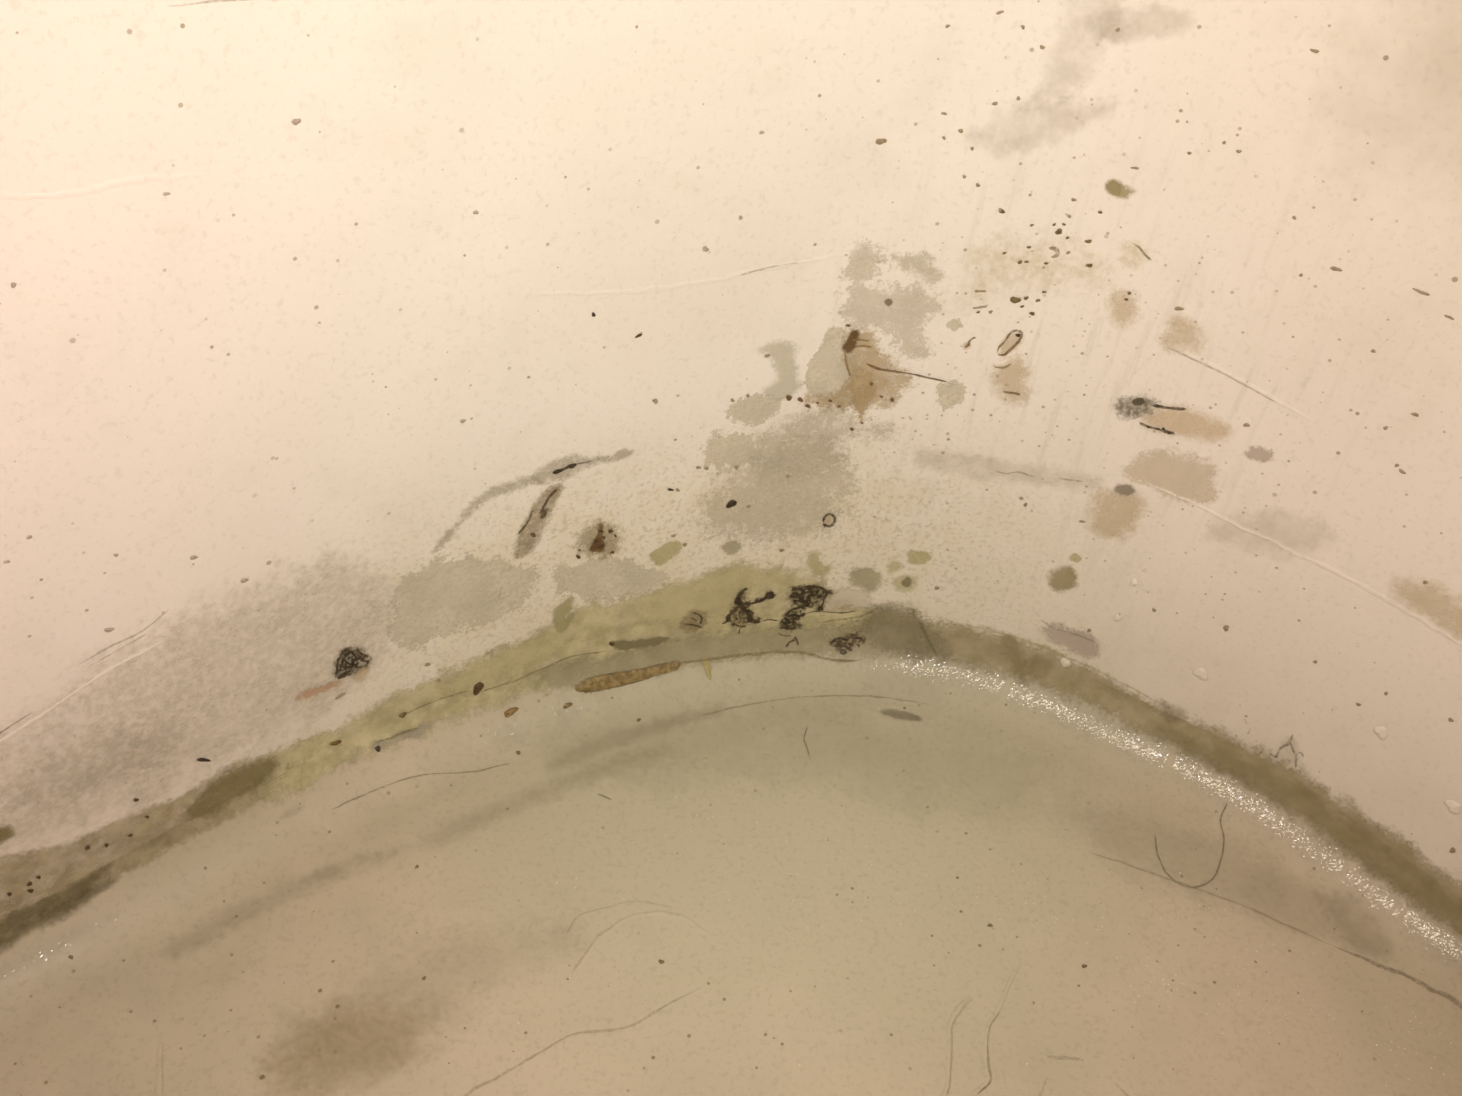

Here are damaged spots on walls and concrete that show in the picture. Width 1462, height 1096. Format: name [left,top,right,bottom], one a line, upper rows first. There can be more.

damp [840,246,976,358]
damp [936,380,966,410]
damp [703,393,854,540]
damp [1115,398,1216,502]
damp [1248,447,1272,461]
damp [387,449,670,650]
damp [1050,554,1081,590]
damp [304,647,369,697]
damp [541,586,918,684]